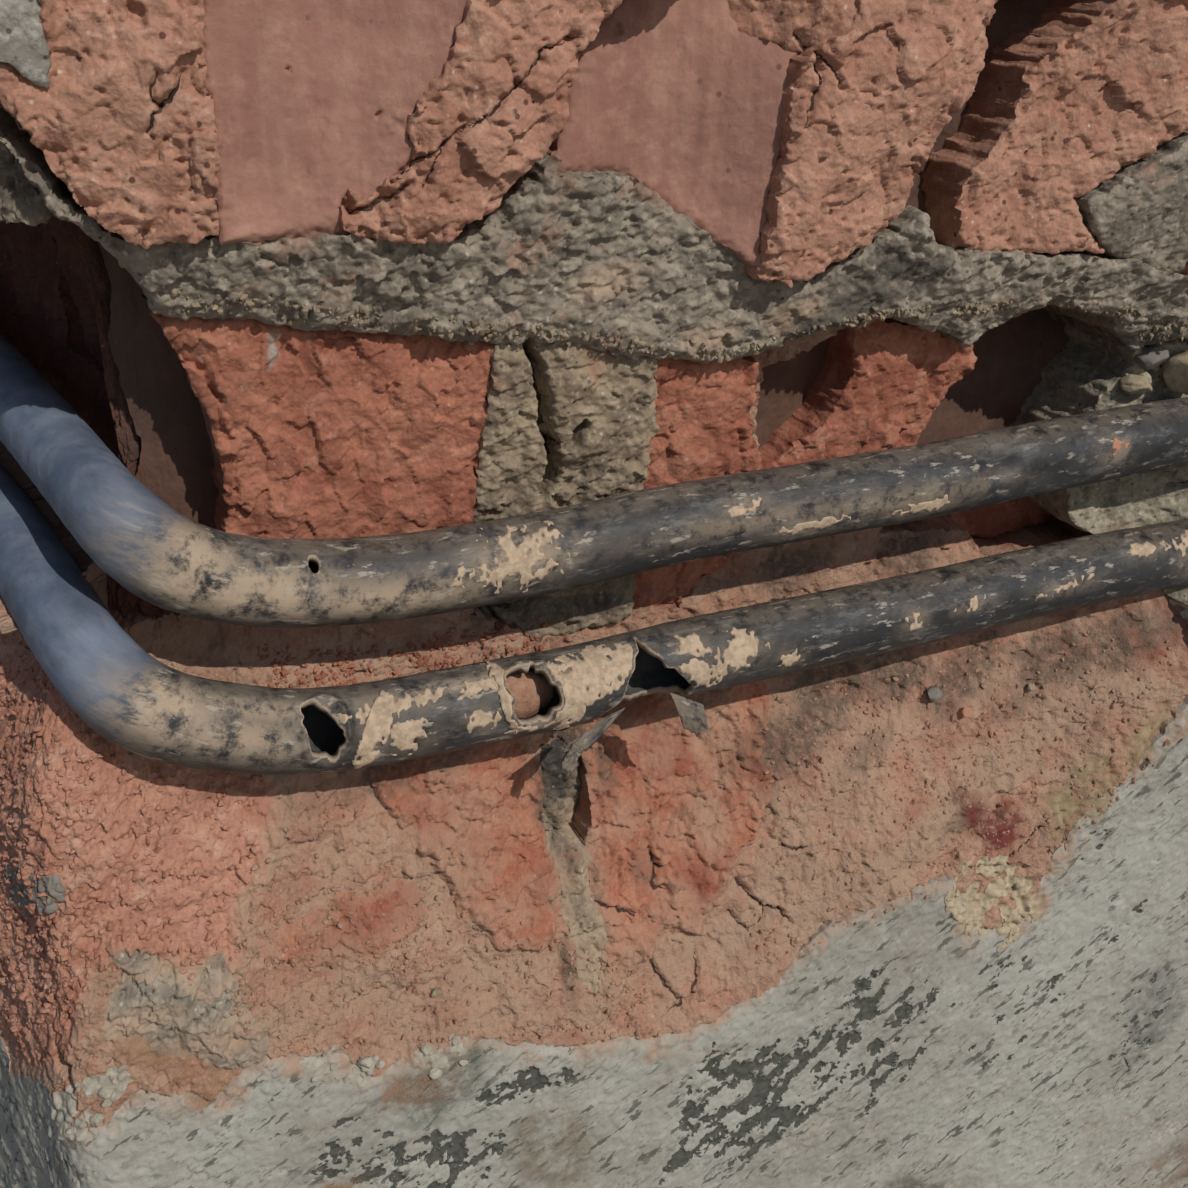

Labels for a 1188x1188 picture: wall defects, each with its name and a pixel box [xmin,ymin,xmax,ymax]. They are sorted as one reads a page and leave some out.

crack [348,36,578,214]
crack [522,343,556,454]
spalling [4,863,66,917]
crack [594,900,637,917]
crack [648,848,666,890]
crack [727,877,789,931]
spalling [944,855,1043,990]
crack [649,951,698,1011]
peeling [980,987,1038,1070]
peeling [1107,997,1171,1061]
spalling [49,1064,131,1146]
peeling [475,1066,580,1106]